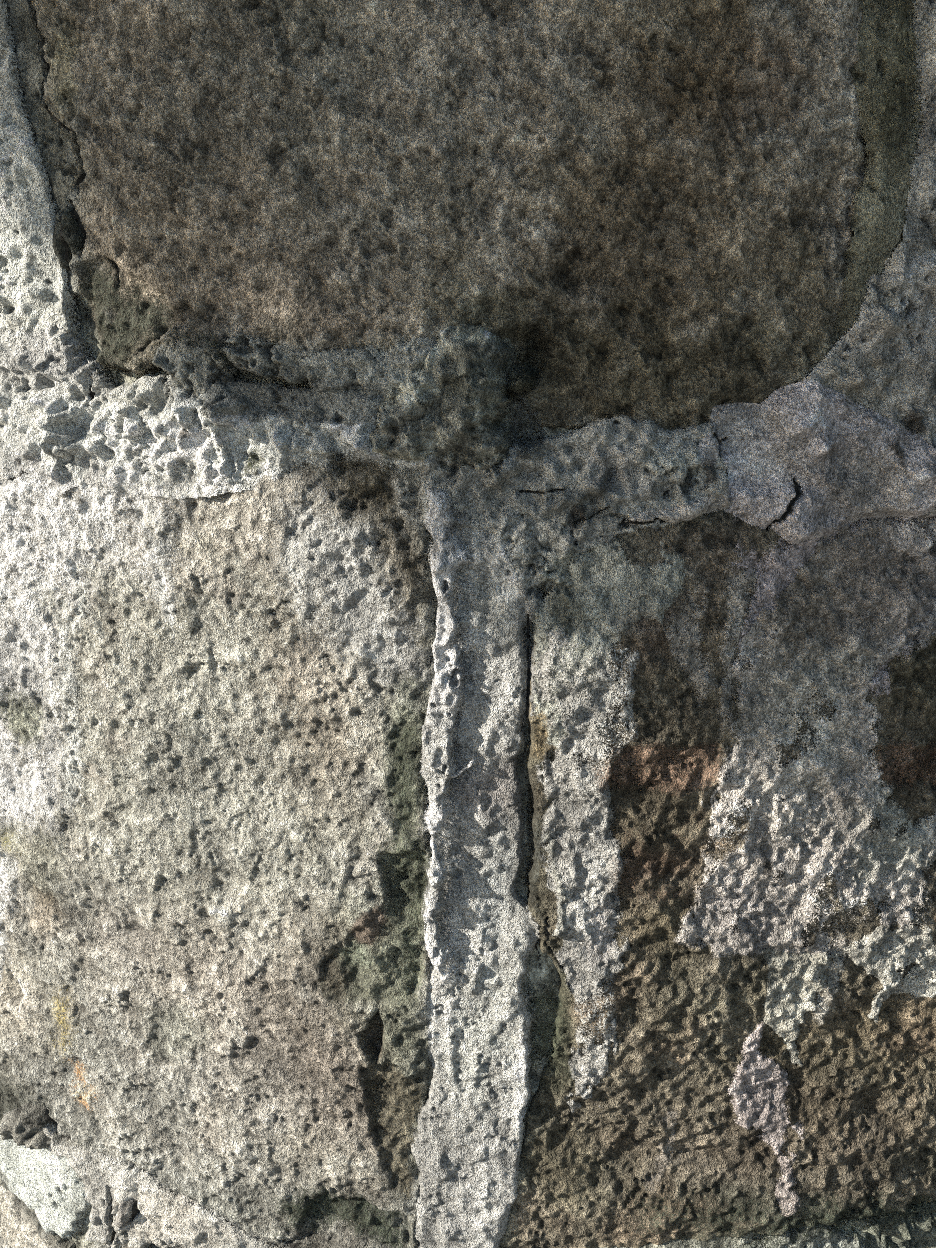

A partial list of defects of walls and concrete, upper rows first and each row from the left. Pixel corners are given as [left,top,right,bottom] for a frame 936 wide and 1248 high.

crack [45,105,120,285]
crack [519,487,565,495]
crack [574,506,663,526]
crack [766,477,801,530]